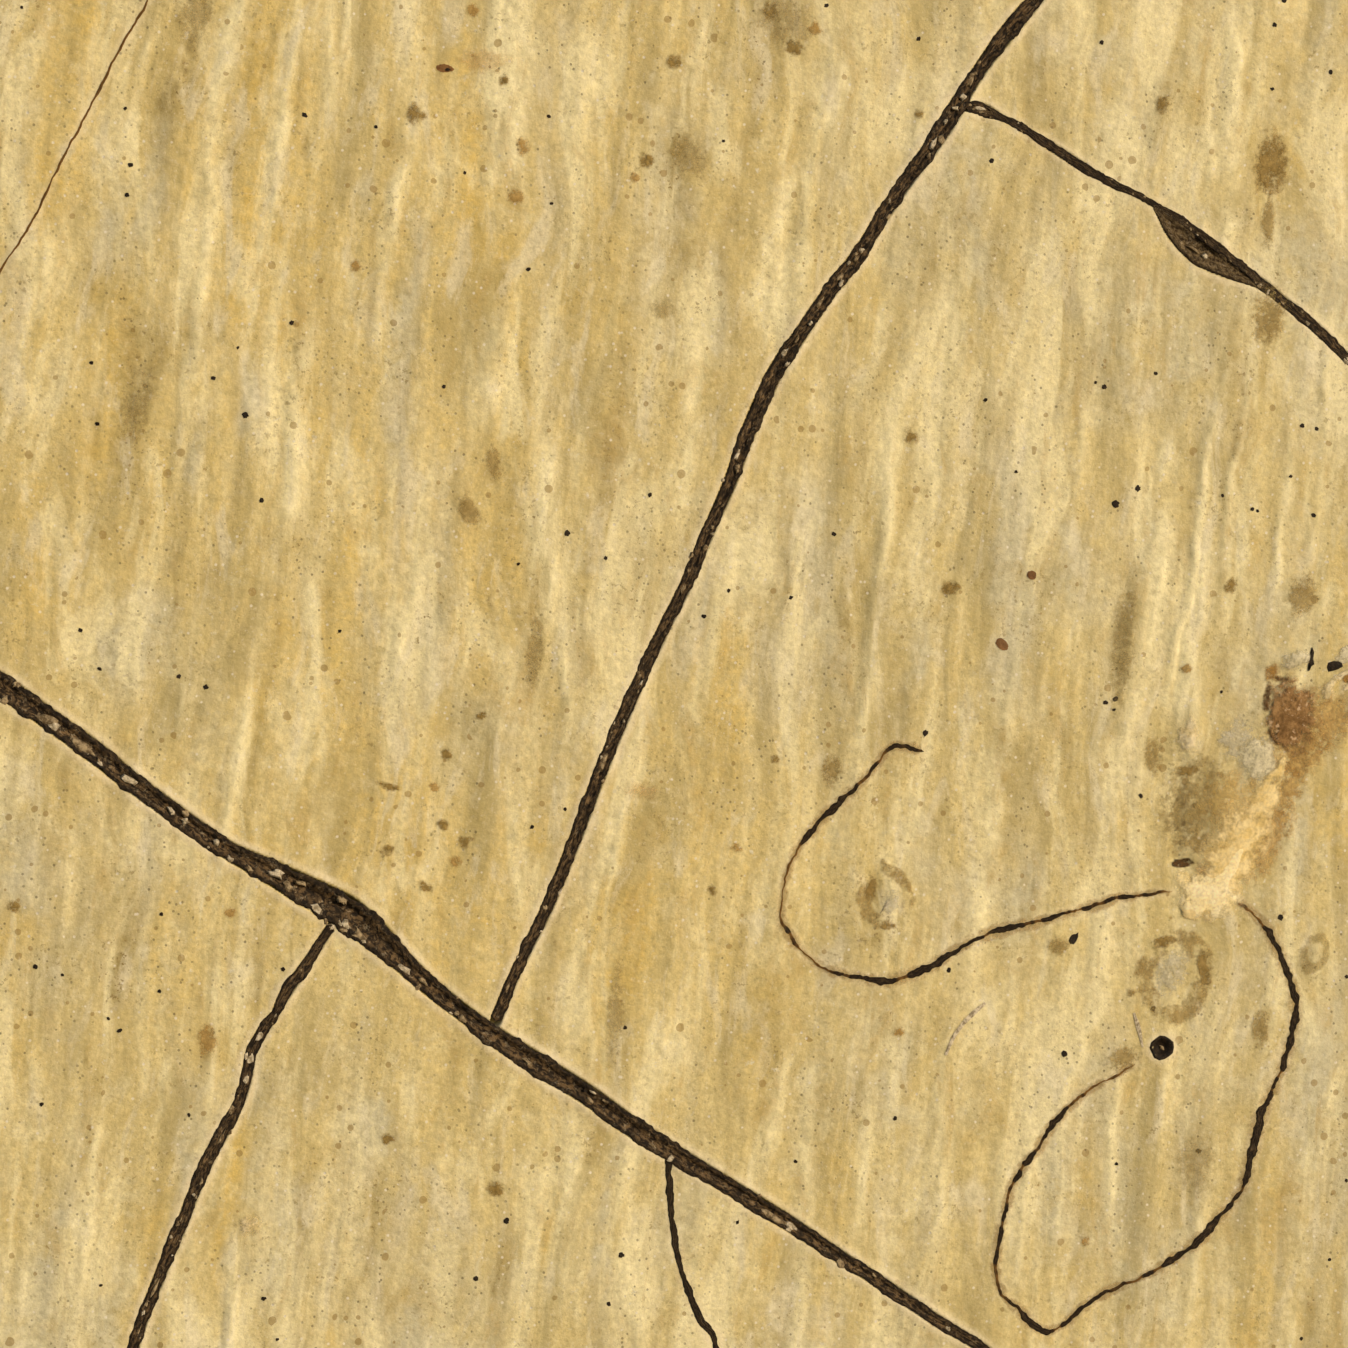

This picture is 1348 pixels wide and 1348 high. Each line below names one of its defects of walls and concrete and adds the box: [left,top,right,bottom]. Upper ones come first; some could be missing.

crack [0,0,148,273]
crack [491,0,1348,1021]
leakage [1145,741,1161,773]
leakage [1178,766,1198,776]
crack [0,671,990,1348]
crack [993,900,1300,1335]